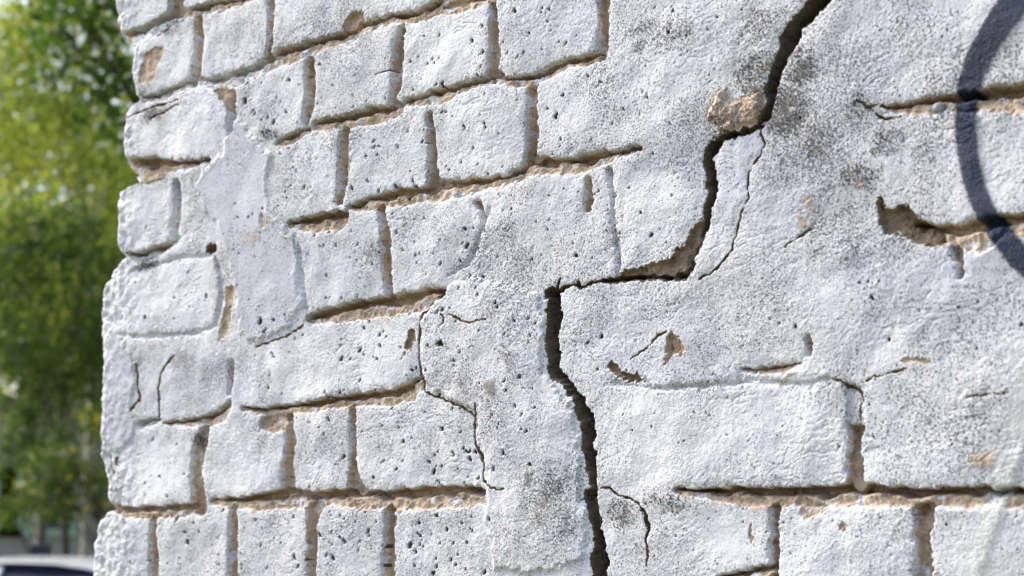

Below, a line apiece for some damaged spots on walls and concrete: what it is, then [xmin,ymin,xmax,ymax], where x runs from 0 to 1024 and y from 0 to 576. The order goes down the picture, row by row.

spalling [137,44,163,86]
spalling [706,85,766,135]
spalling [853,180,950,249]
crack [544,0,832,576]
crack [130,355,175,419]
crack [417,295,505,491]
spalling [607,360,646,383]
spalling [663,331,685,366]